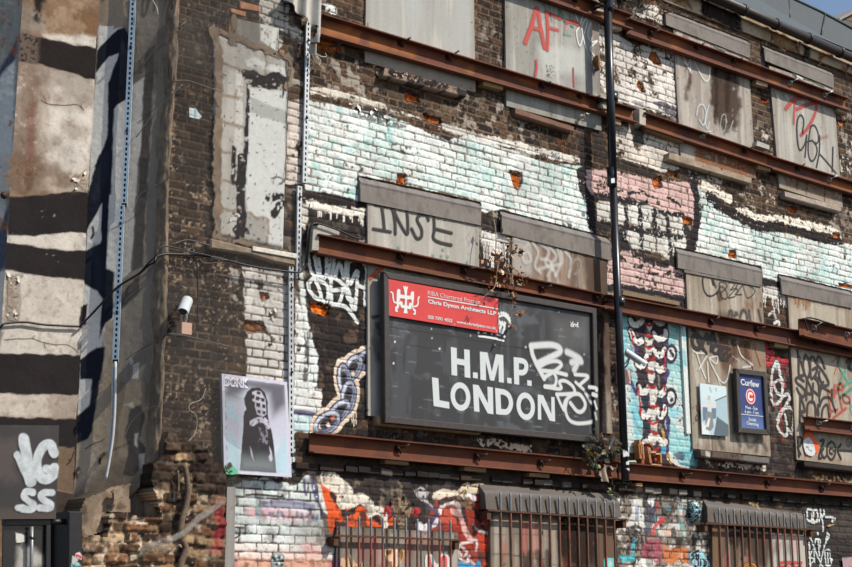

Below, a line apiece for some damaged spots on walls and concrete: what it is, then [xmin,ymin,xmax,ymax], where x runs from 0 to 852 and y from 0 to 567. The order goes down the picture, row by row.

peeling [349,103,390,121]
spalling [509,170,522,190]